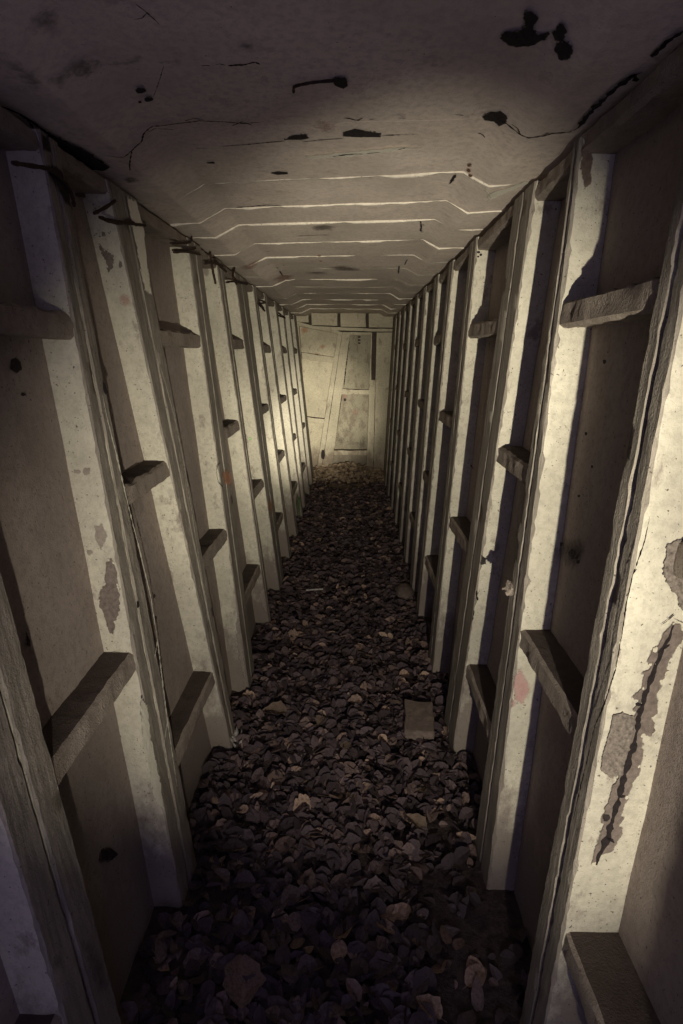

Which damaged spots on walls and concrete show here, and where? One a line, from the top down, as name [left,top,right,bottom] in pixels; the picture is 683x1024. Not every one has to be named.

spalling [500,10,573,61]
spalling [292,77,348,94]
crack [461,31,683,139]
crack [111,118,414,170]
spalling [284,133,308,141]
spalling [343,129,382,137]
peeling [97,559,120,637]
spalling [662,539,683,611]
crack [572,517,650,822]
peeling [592,622,683,867]
crack [596,614,683,865]